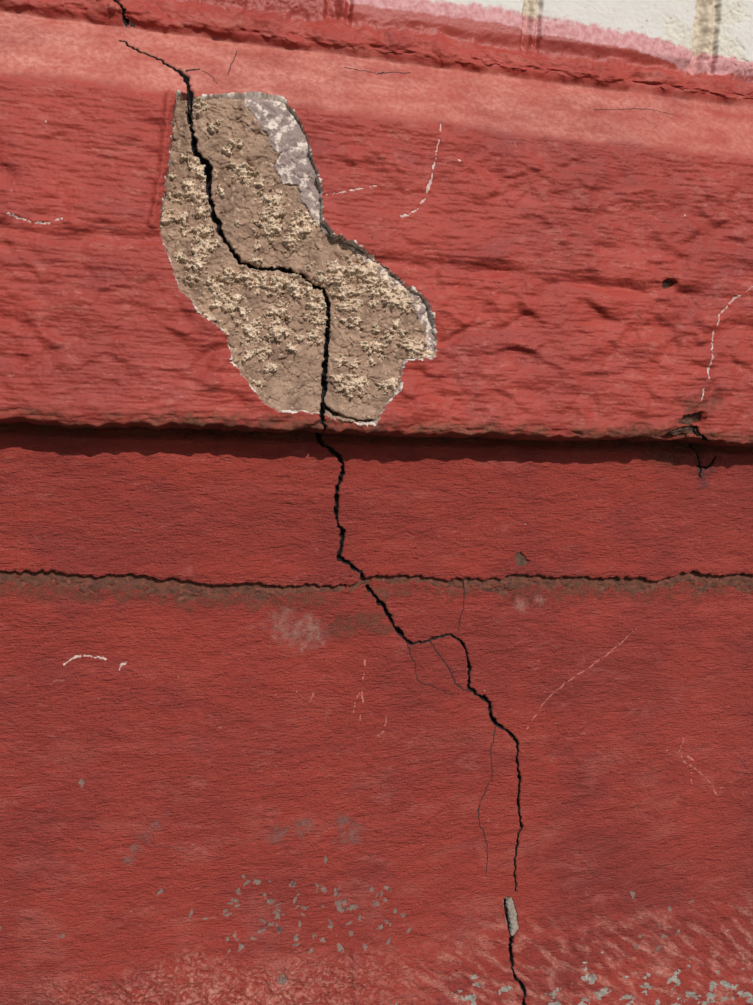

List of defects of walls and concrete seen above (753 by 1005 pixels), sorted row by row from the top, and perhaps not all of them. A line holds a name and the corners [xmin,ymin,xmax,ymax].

spalling [160,90,437,427]
crack [701,286,753,401]
crack [689,426,716,478]
crack [113,0,637,1005]
peeling [221,874,308,954]
peeling [308,883,362,954]
peeling [369,885,406,945]
peeling [503,896,519,936]
peeling [449,974,484,1005]
peeling [543,957,753,1005]